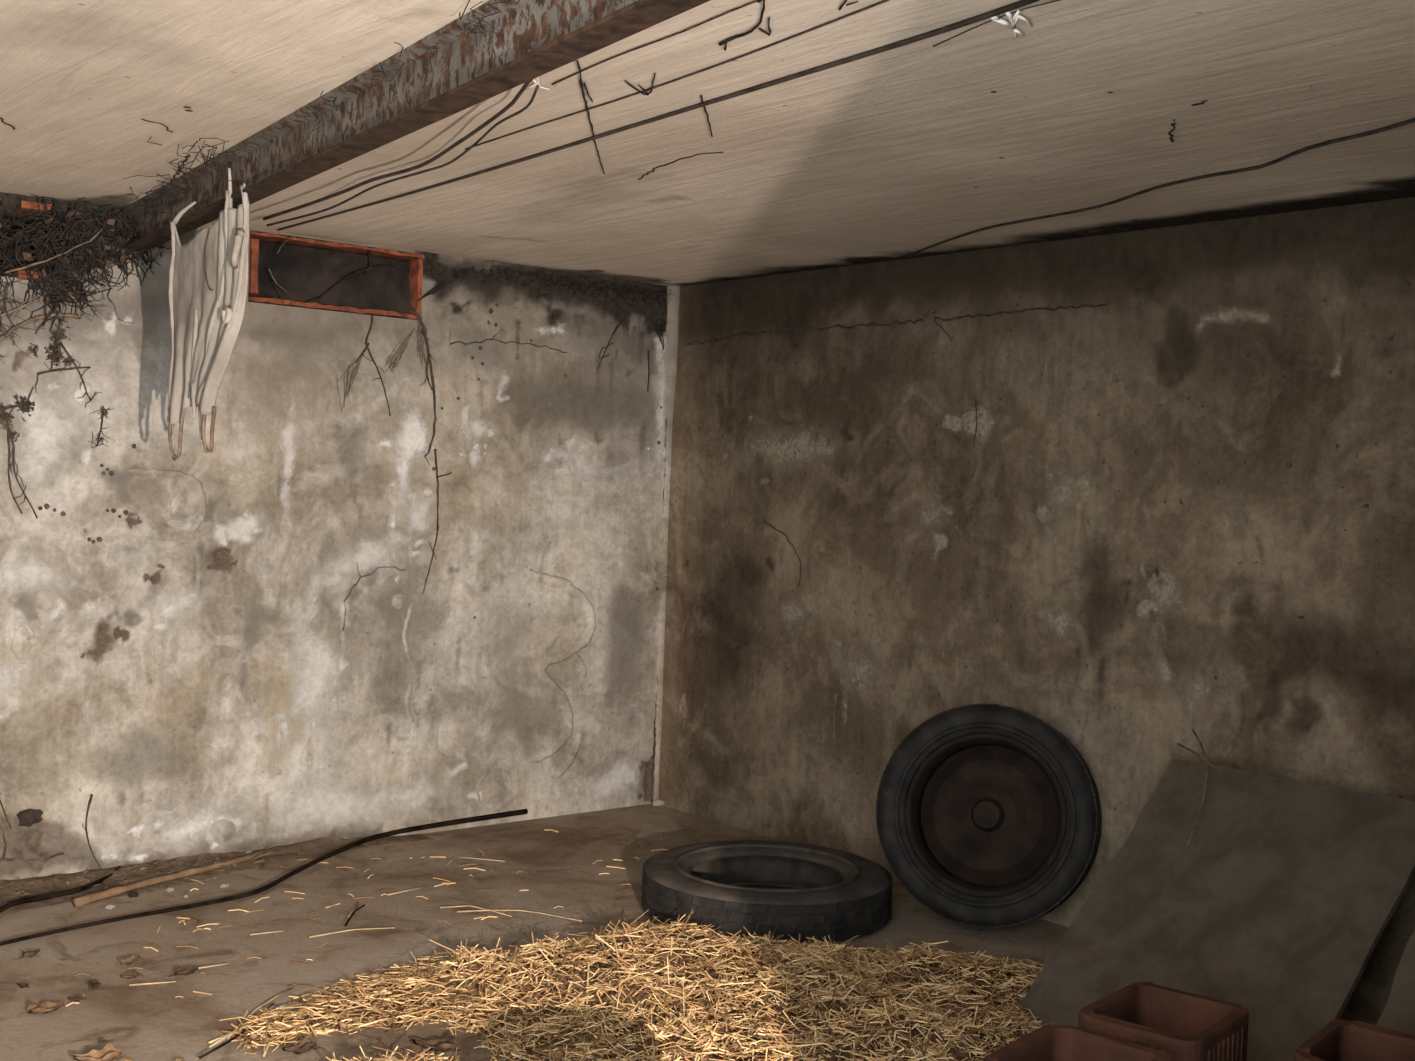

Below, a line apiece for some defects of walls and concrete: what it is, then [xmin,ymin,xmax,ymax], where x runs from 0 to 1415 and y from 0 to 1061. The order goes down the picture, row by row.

leakage [105,315,132,334]
leakage [418,251,667,477]
leakage [0,560,53,587]
leakage [19,384,71,481]
leakage [50,599,66,619]
leakage [84,594,196,630]
leakage [204,503,260,561]
leakage [281,406,298,504]
efflorescence [326,413,434,585]
efflorescence [277,633,347,747]
leakage [0,761,432,869]
leakage [573,761,646,798]